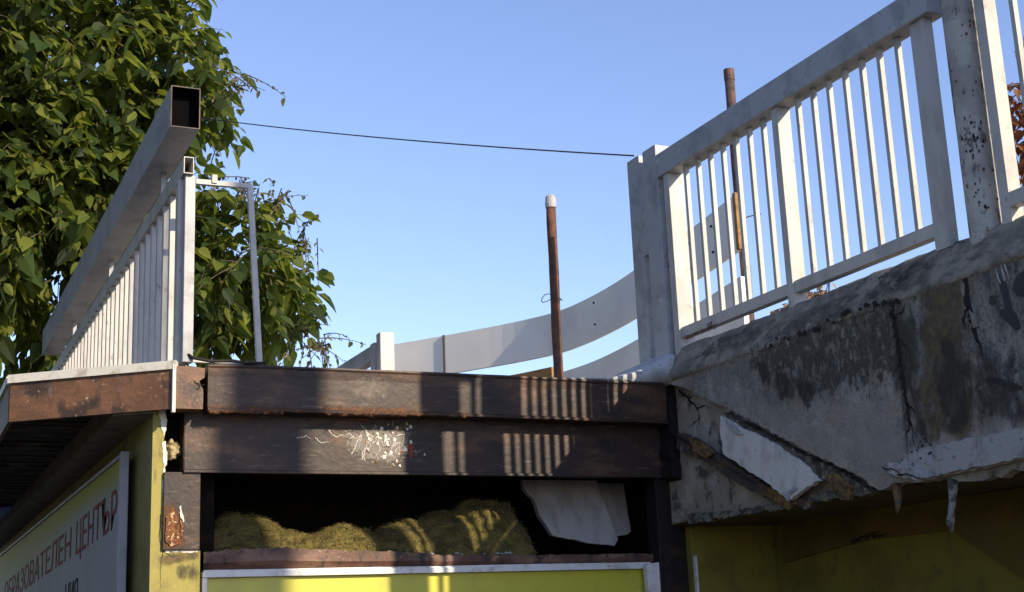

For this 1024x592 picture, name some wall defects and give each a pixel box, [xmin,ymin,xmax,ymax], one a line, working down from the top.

damp [702,254,1024,438]
crack [873,259,934,449]
crack [960,277,983,358]
crack [678,389,708,427]
spalling [671,412,882,524]
flaking render [882,437,943,481]
spalling [950,460,1024,482]
corrosion [165,503,185,548]